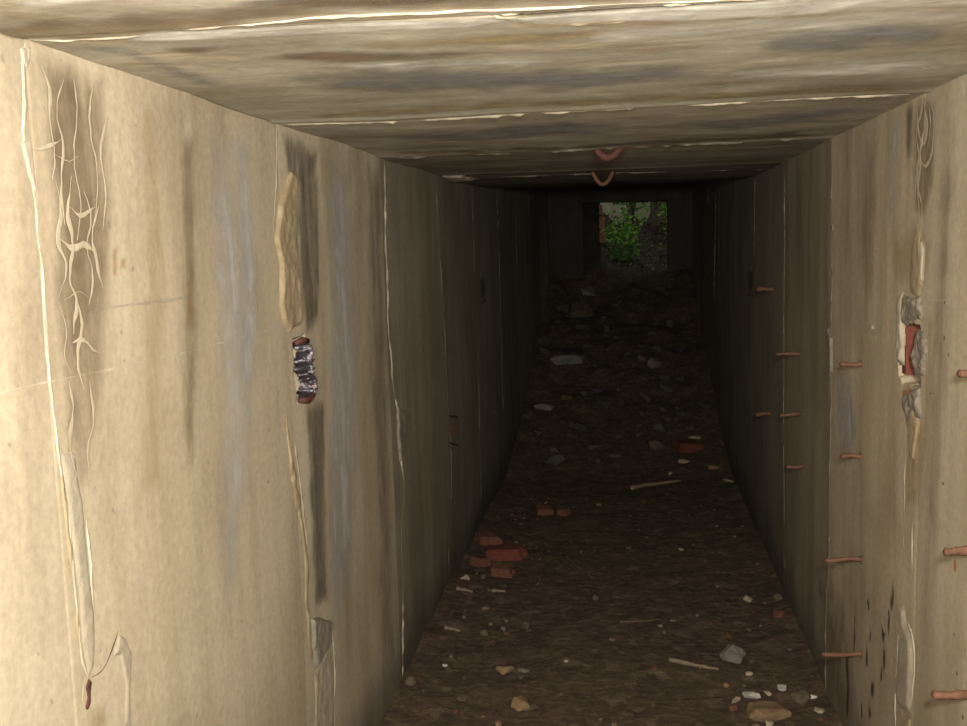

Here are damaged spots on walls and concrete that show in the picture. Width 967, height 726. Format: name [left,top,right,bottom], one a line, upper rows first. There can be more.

crack [0,65,276,487]
spalling [895,221,928,495]